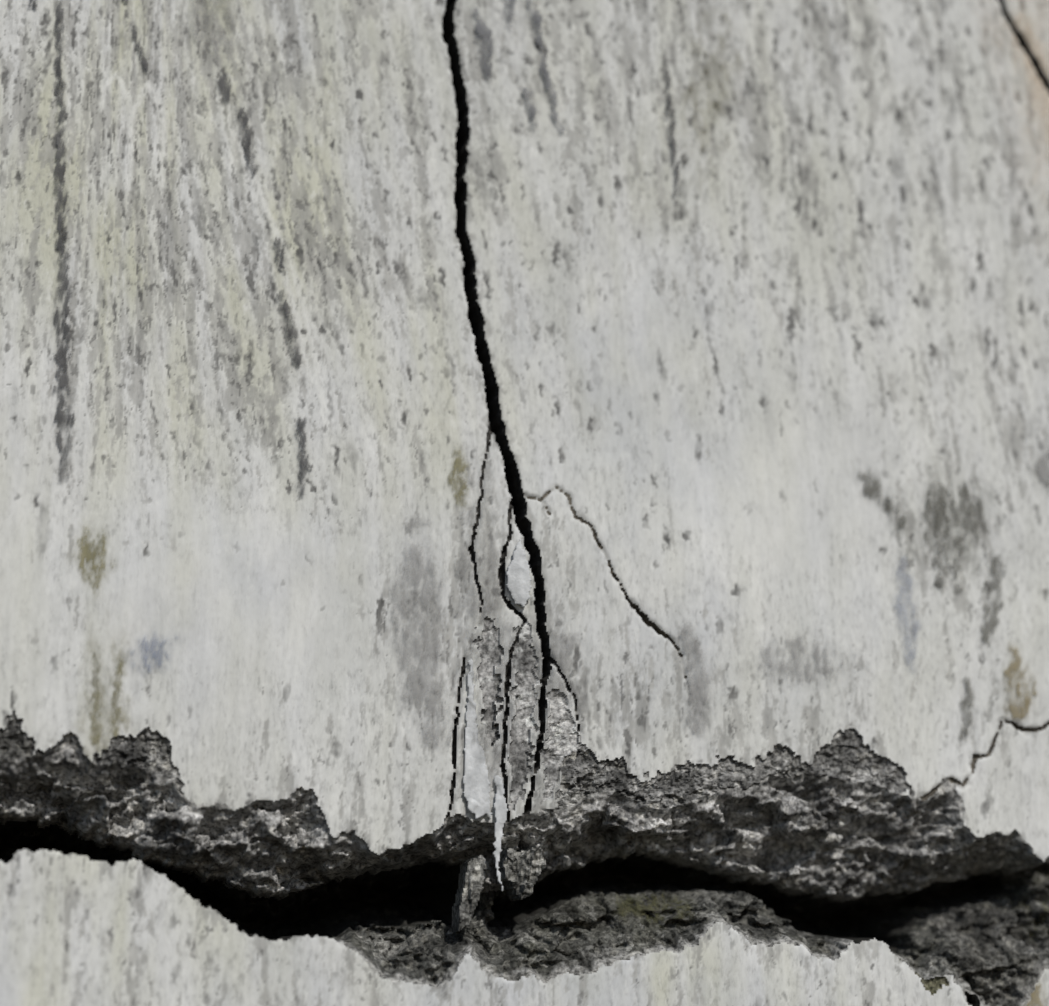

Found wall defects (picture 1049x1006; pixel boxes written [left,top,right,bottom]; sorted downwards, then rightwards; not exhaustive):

crack [998,0,1049,93]
crack [442,0,580,815]
crack [555,486,603,549]
crack [607,560,683,657]
crack [0,636,1049,1006]